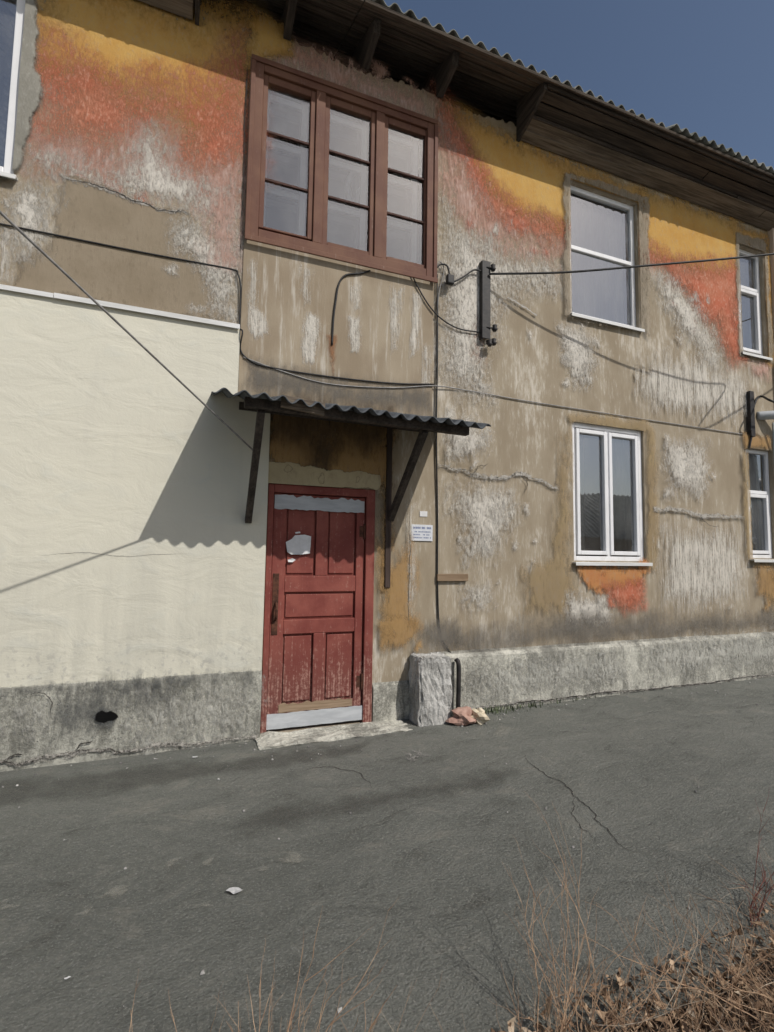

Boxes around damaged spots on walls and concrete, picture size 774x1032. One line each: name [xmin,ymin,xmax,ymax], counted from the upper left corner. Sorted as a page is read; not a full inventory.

crack [59,173,188,215]
damp [247,260,268,338]
damp [250,265,431,410]
peeling [0,0,774,628]
crack [437,462,559,493]
damp [426,436,774,652]
crack [653,506,745,527]
crack [526,759,631,851]